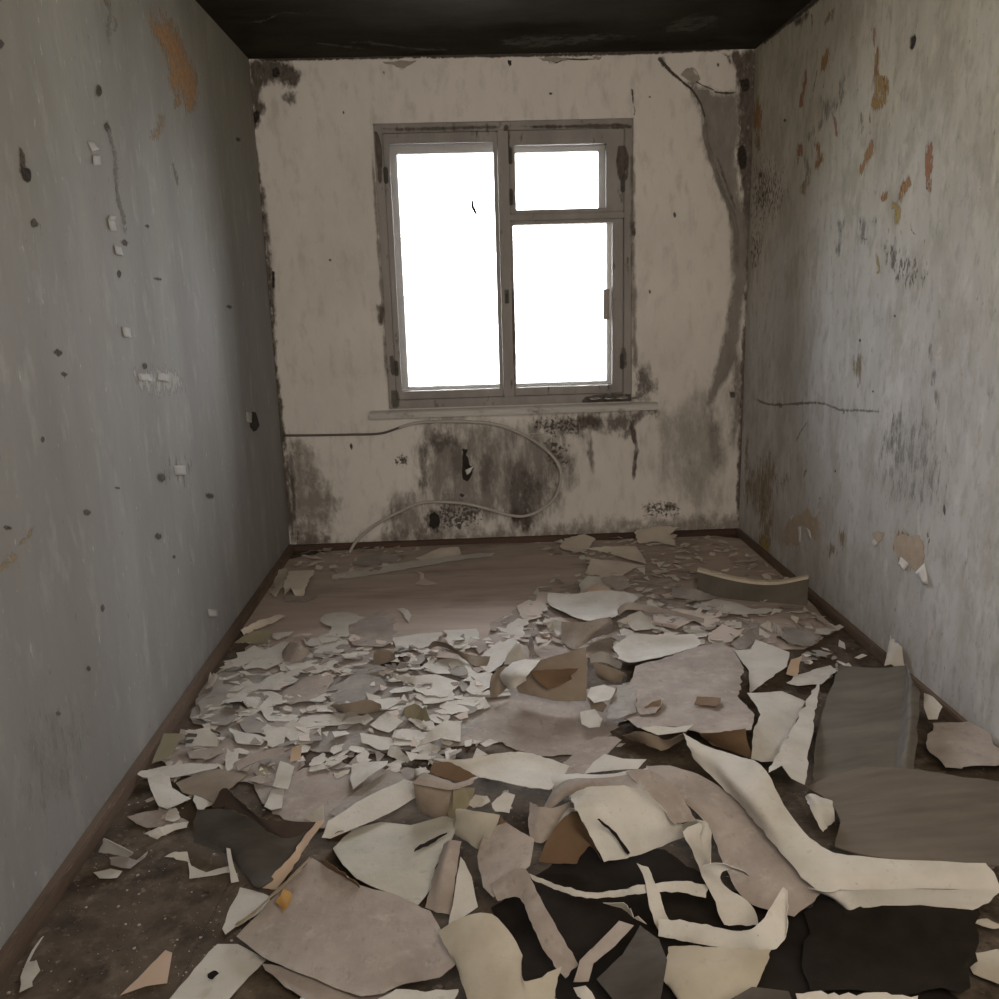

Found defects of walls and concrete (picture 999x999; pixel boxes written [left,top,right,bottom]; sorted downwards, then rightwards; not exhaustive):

leakage [249,59,301,128]
peeling [860,28,889,127]
peeling [797,82,842,195]
peeling [859,140,874,175]
peeling [881,177,911,223]
peeling [925,143,933,192]
leakage [257,152,330,544]
leakage [632,277,653,399]
crack [757,399,878,437]
leakage [382,410,656,541]
peeling [871,531,930,585]